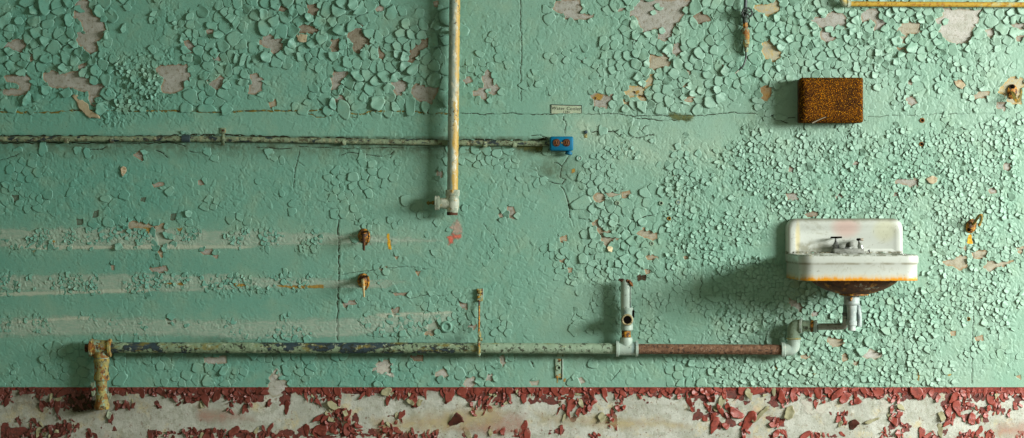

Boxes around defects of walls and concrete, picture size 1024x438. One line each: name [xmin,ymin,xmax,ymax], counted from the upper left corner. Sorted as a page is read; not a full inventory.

peeling [0,142,313,299]
flaking render [0,0,513,120]
peeling [323,150,403,262]
crack [0,0,795,220]
peeling [434,139,548,188]
peeling [539,0,1024,438]
peeling [220,312,312,343]
crack [336,219,397,340]
peeling [341,263,513,343]
peeling [0,334,122,438]
peeling [106,353,608,438]